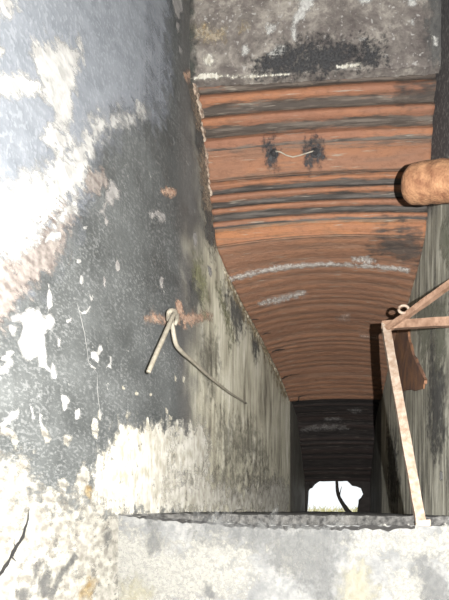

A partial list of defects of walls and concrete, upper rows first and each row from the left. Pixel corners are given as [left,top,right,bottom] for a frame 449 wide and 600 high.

water stain [291,0,314,41]
water stain [355,36,390,74]
water stain [303,135,326,168]
peeling [0,0,183,379]
water stain [230,218,423,282]
rust [144,300,213,329]
water stain [259,290,306,306]
peeling [1,410,19,429]
peeling [91,408,289,515]
crack [0,508,36,581]